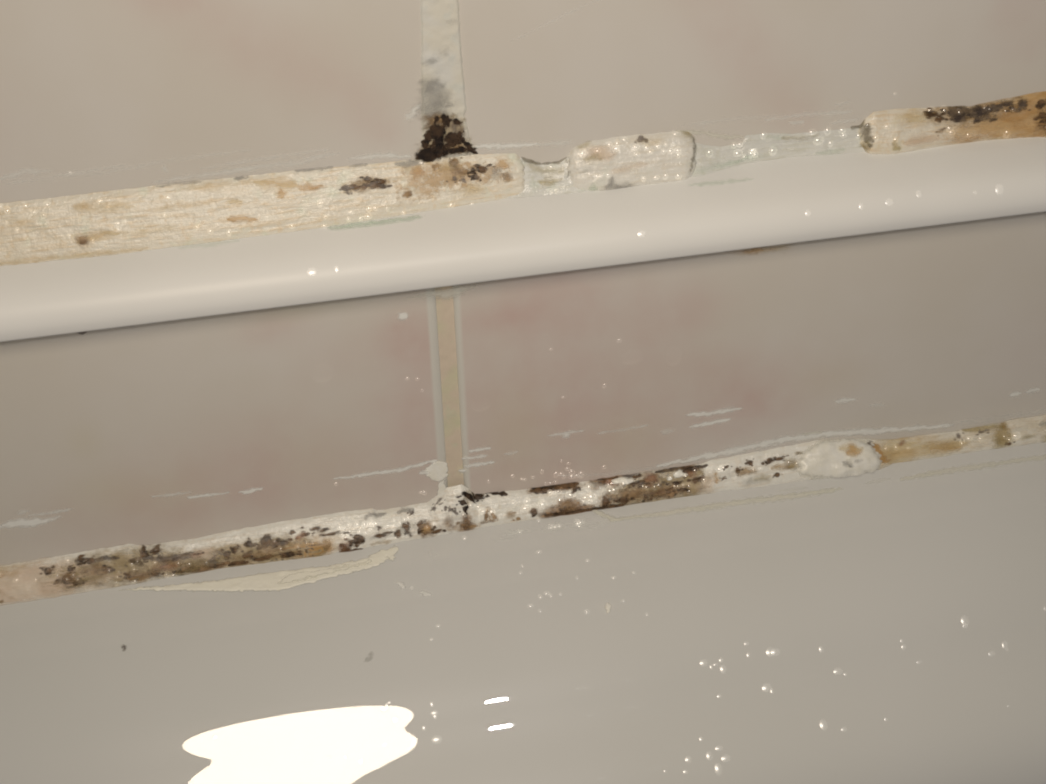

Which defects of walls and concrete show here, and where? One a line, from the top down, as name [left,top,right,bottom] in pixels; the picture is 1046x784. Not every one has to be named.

leakage [340,81,510,198]
leakage [924,100,1046,123]
leakage [40,452,800,588]